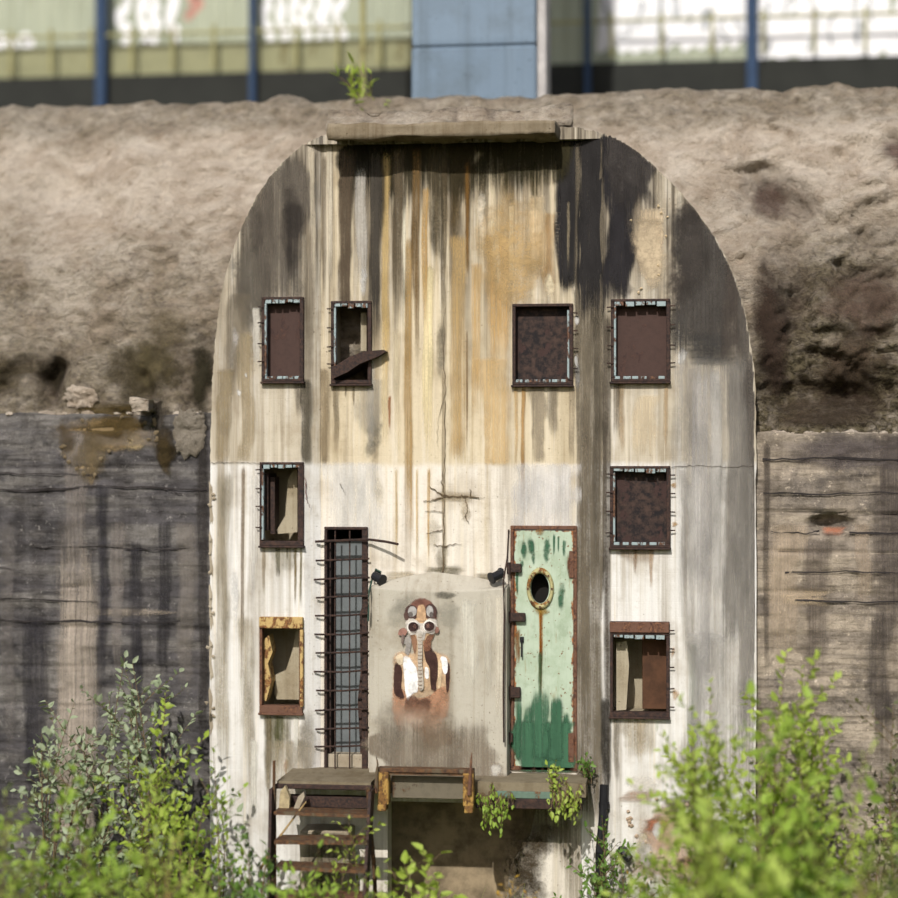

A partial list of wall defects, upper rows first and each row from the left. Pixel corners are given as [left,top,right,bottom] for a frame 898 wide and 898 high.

damp [23,618,48,805]
damp [57,399,171,841]
spalling [59,408,207,483]
rust [395,191,430,543]
damp [181,134,656,810]
crack [423,312,485,572]
rust [452,163,481,452]
peeling [509,693,575,772]
peeling [514,465,578,592]
damp [798,439,898,600]
damp [869,615,892,734]